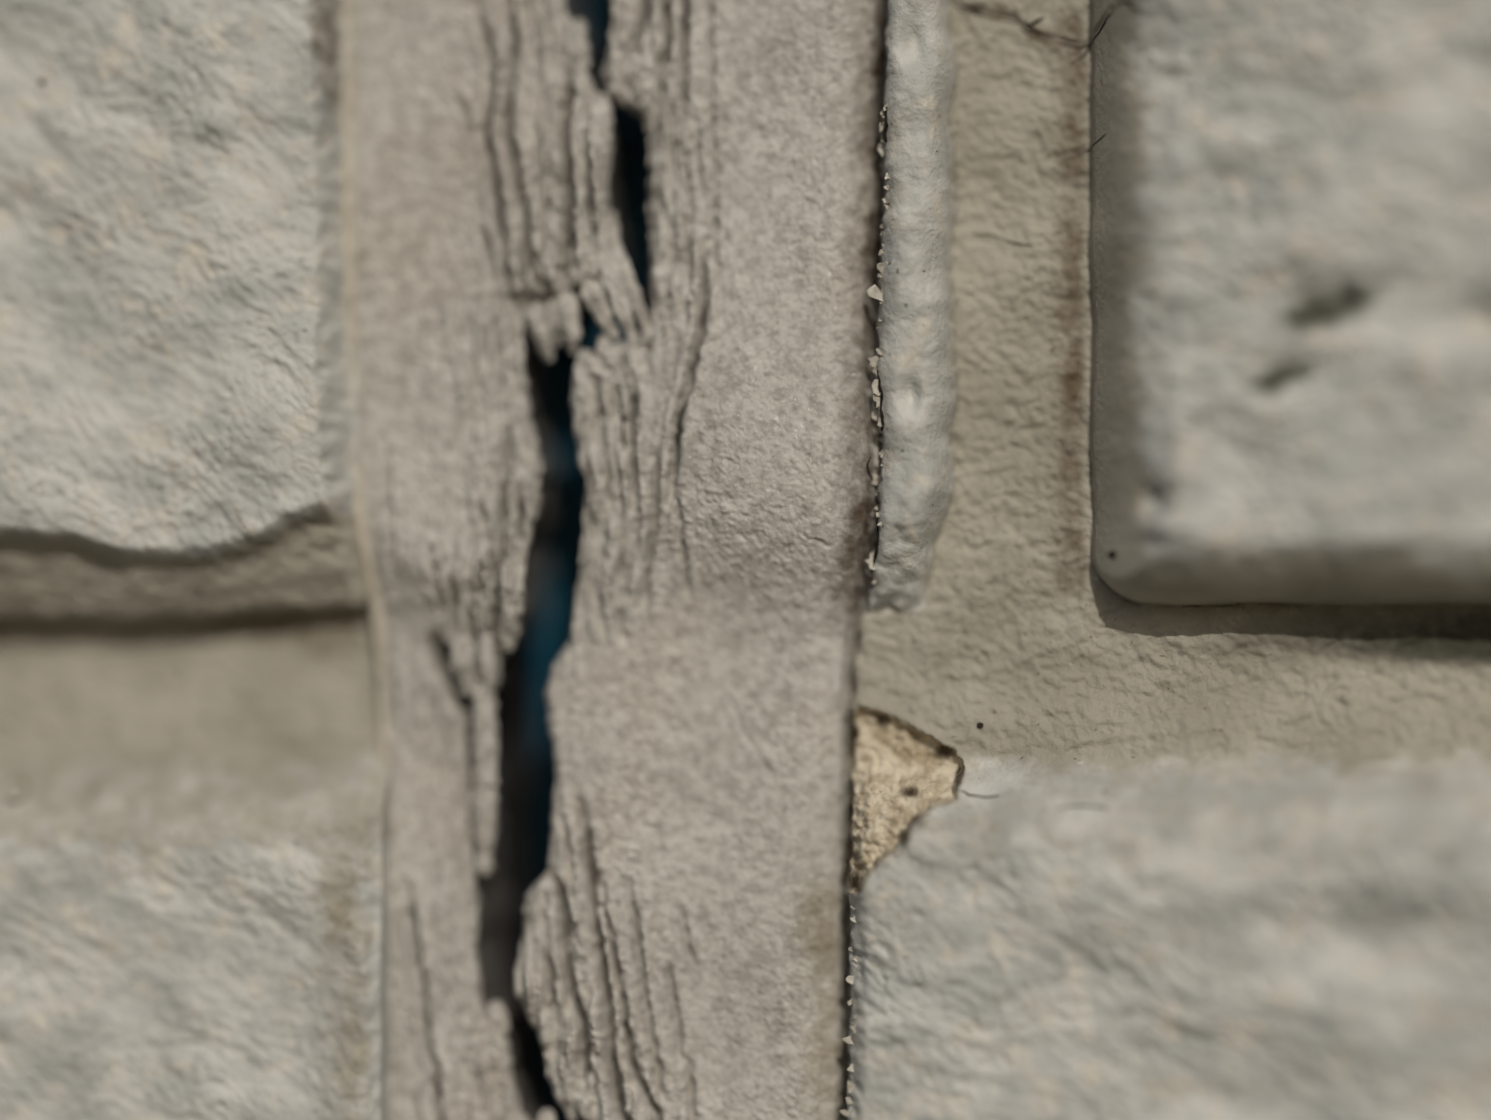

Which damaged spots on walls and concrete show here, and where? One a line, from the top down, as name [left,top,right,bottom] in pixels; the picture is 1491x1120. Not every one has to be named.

crack [951,0,1142,64]
crack [673,271,707,486]
crack [443,0,689,1120]
spalling [846,707,964,894]
crack [410,901,443,1120]